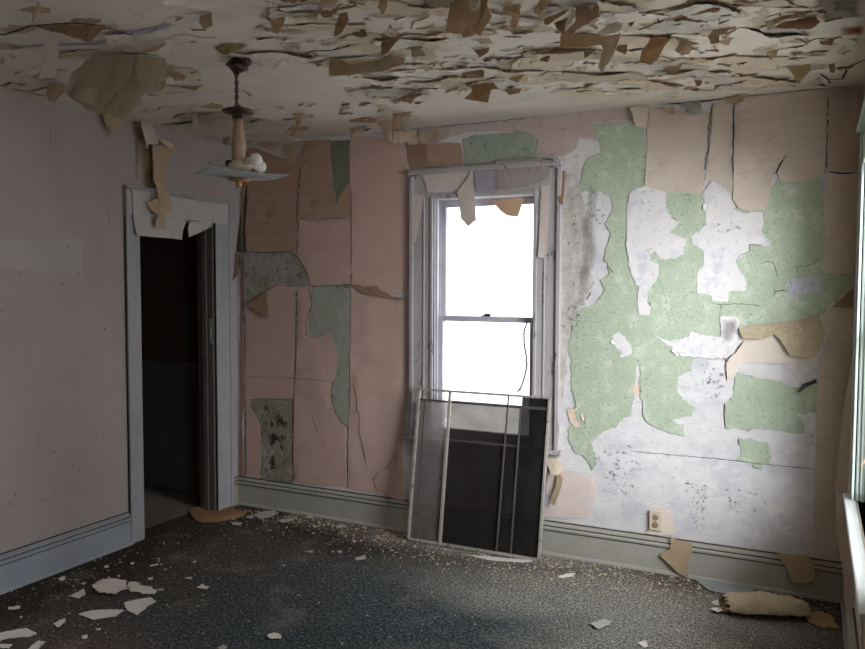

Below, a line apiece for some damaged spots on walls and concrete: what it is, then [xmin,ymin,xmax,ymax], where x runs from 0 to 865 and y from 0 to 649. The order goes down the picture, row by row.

peeling [0,0,92,50]
peeling [71,18,217,53]
crack [670,98,735,171]
peeling [160,0,858,470]
peeling [249,399,294,483]
damp [262,407,287,470]